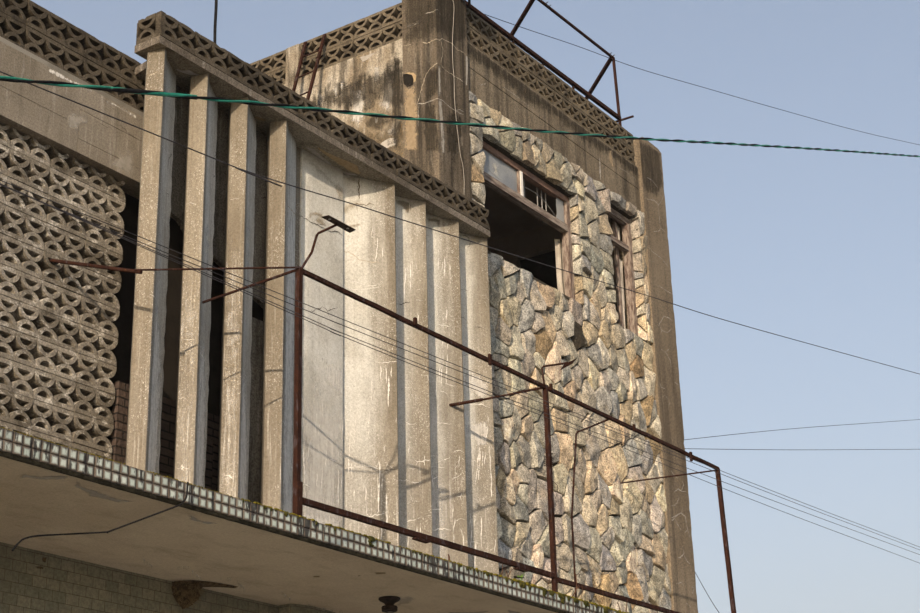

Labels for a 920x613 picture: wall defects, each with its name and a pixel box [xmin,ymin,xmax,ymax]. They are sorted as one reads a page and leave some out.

damp [345,57,461,158]
crack [405,38,529,122]
damp [406,0,662,195]
damp [283,214,367,527]
damp [366,366,392,436]
damp [466,373,486,398]
damp [378,462,388,539]
crack [330,444,477,531]
damp [452,513,482,568]
damp [468,418,492,497]